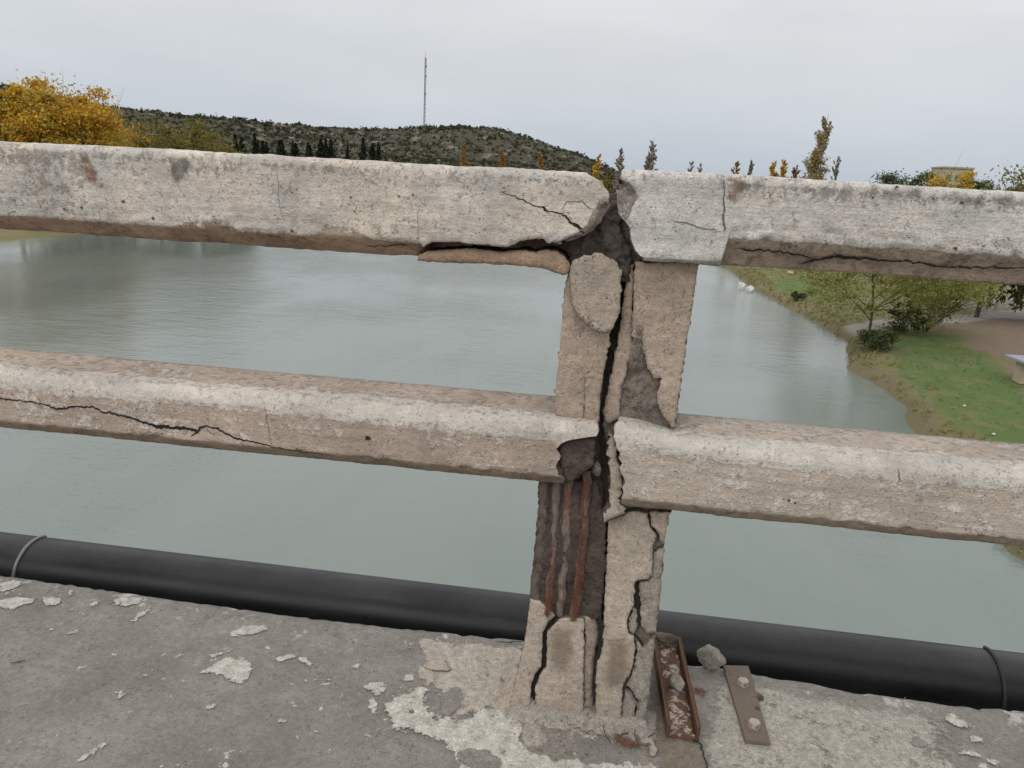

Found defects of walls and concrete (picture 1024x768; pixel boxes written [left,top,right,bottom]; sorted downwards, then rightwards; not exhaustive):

spalling [418,182,638,333]
crack [502,192,590,234]
crack [676,177,1023,269]
spalling [616,326,675,429]
crack [0,398,331,456]
spalling [529,436,607,620]
peeling [0,580,98,614]
peeling [114,597,154,622]
peeling [199,650,253,683]
peeling [364,638,657,768]
crack [563,581,658,748]
rust [658,643,707,738]